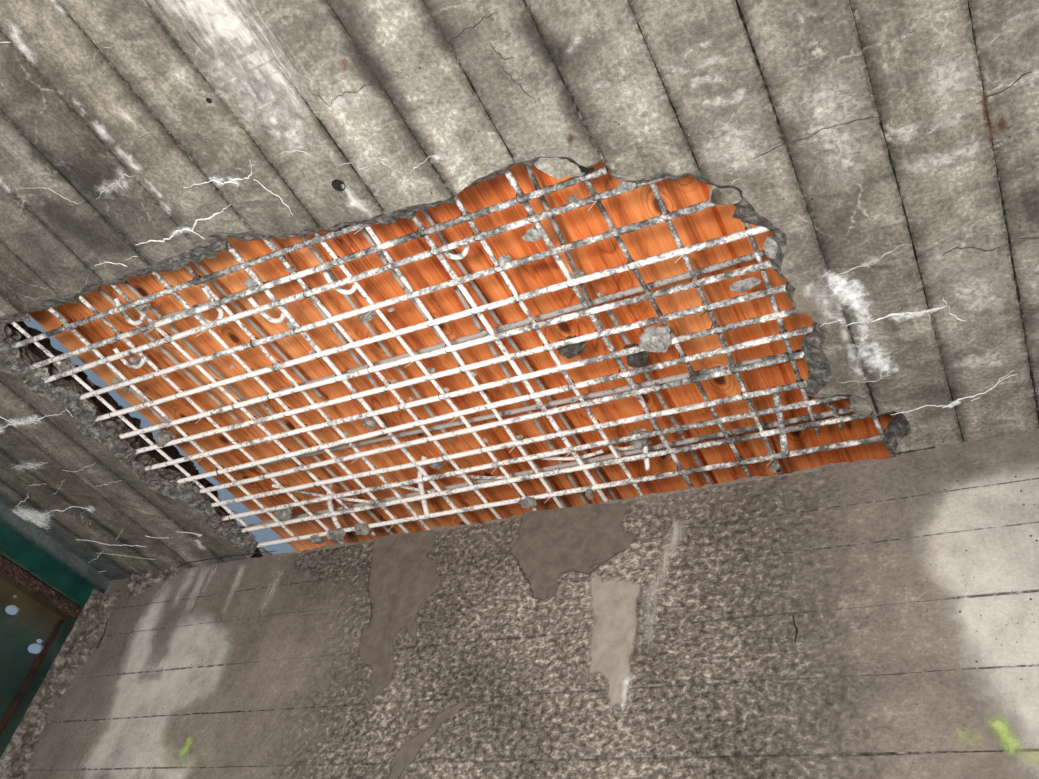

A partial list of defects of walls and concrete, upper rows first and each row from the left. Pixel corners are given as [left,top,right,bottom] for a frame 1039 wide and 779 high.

peeling [705,120,765,173]
crack [83,159,293,288]
leakage [800,273,898,380]
crack [820,297,966,327]
crack [891,370,1017,415]
crack [0,409,73,432]
spalling [0,156,911,779]
crack [12,462,122,529]
crack [76,531,277,572]